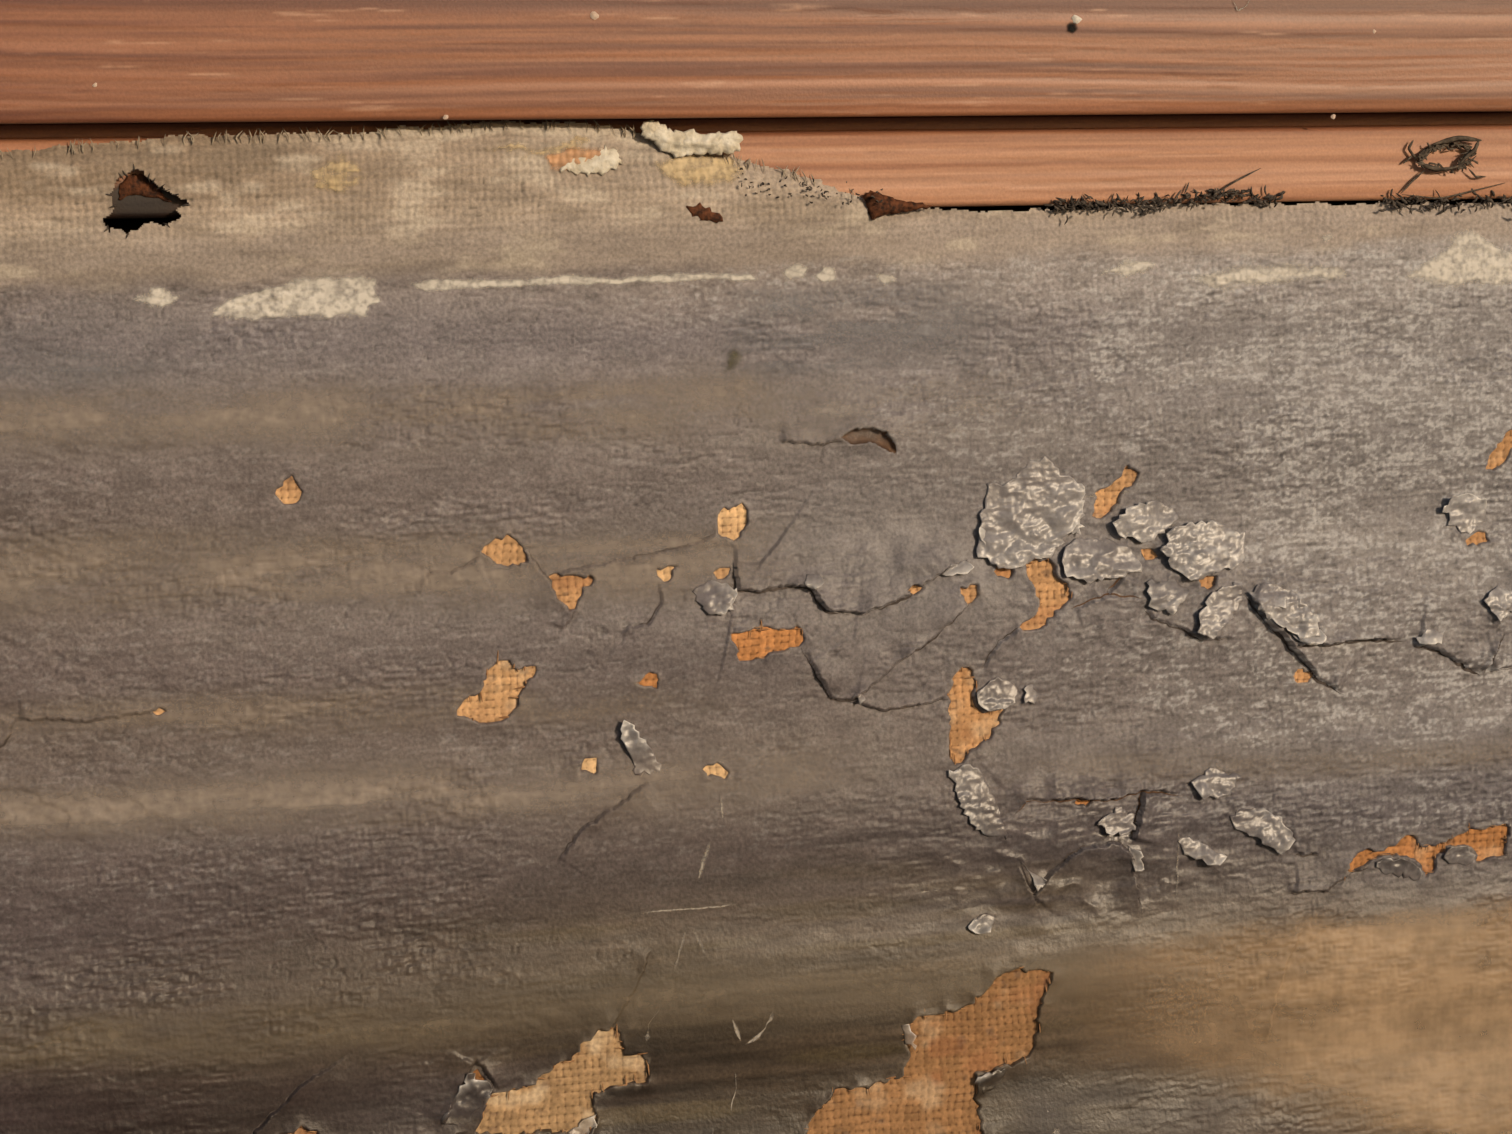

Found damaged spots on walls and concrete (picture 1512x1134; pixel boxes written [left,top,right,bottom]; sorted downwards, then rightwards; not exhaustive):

crack [780,439,843,447]
peeling [718,503,747,540]
peeling [941,455,1327,645]
peeling [731,620,804,661]
peeling [457,653,536,723]
crack [0,712,154,748]
peeling [947,667,1037,839]
peeling [1097,806,1145,871]
peeling [1191,766,1295,855]
peeling [1344,824,1508,881]
peeling [441,1024,649,1134]
peeling [804,967,1051,1134]